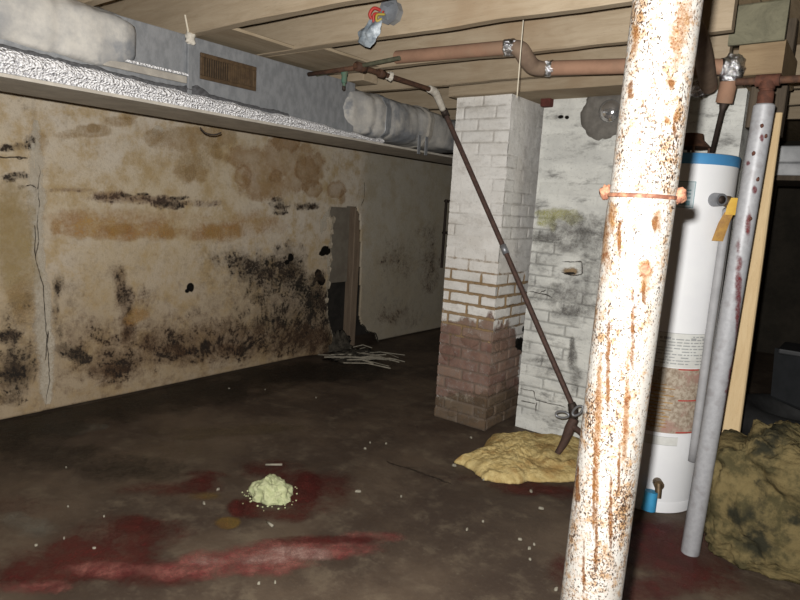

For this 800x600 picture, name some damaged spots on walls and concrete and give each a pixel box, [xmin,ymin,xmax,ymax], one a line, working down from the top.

rust [670,3,691,50]
damp [94,192,201,210]
damp [272,197,319,215]
damp [539,210,603,250]
rust [602,207,621,261]
crack [27,172,50,407]
damp [0,239,382,450]
peeling [436,259,528,420]
rust [626,261,652,368]
rust [592,323,611,568]
rust [608,380,631,548]